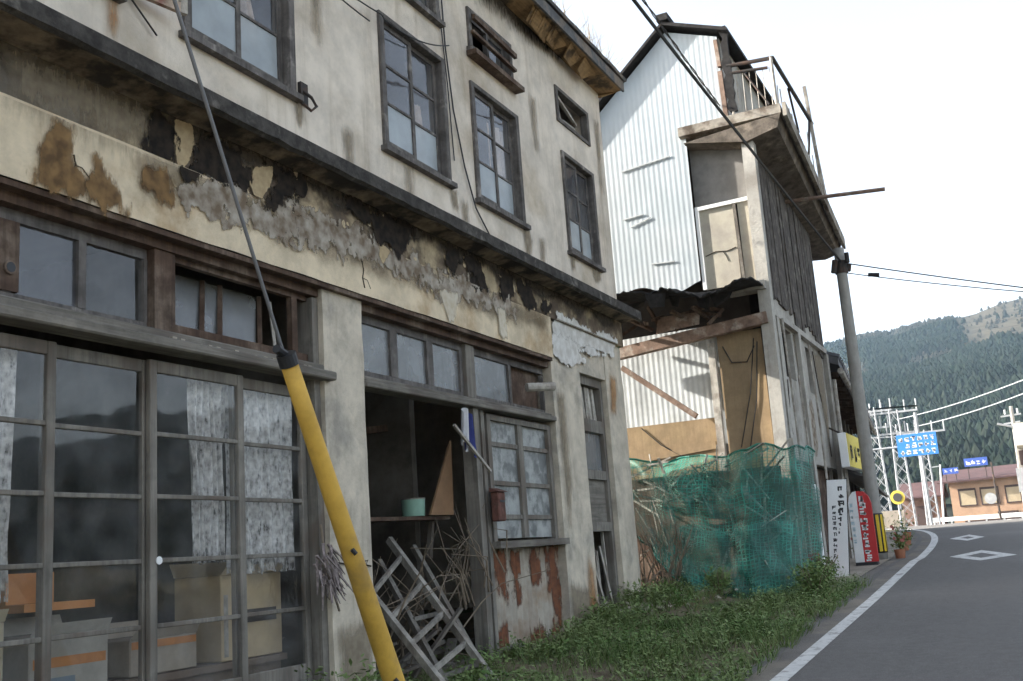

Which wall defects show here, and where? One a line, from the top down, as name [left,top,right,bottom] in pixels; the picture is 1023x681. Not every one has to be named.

damp [11,45,170,218]
damp [141,165,185,209]
damp [329,240,401,274]
spalling [141,106,618,367]
damp [440,285,546,339]
corrosion [493,545,563,643]
corrosion [499,622,509,655]